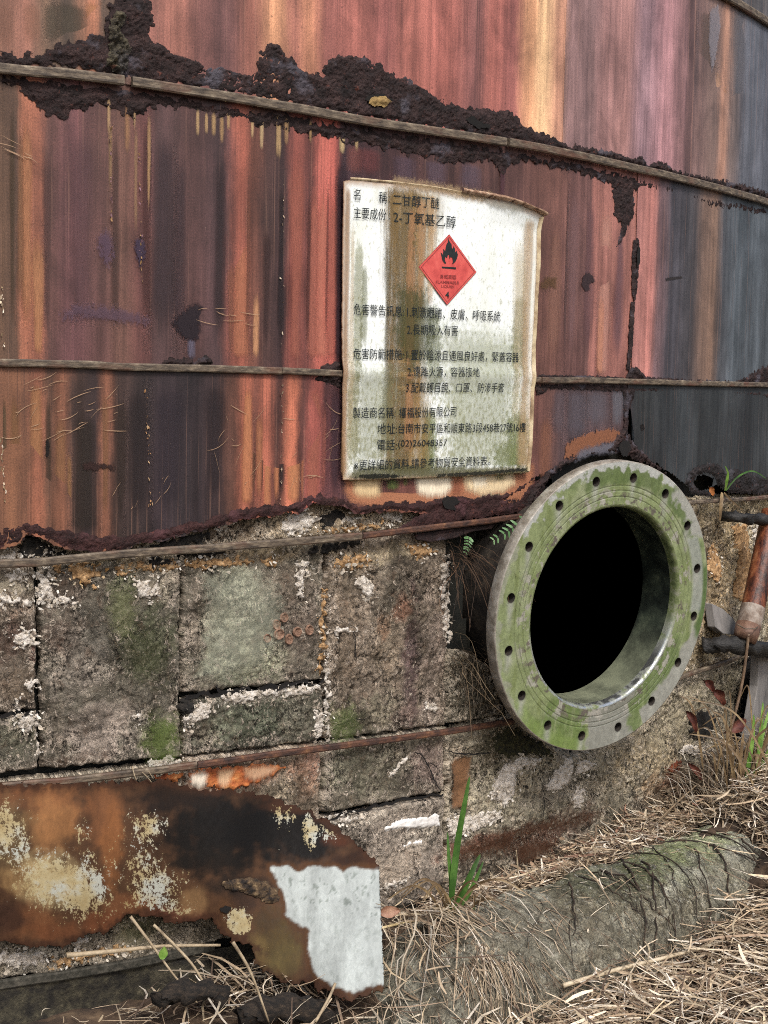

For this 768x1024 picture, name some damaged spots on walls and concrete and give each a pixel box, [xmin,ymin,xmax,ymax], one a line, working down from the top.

corrosion [0,0,768,552]
corrosion [154,763,286,791]
corrosion [452,808,604,869]